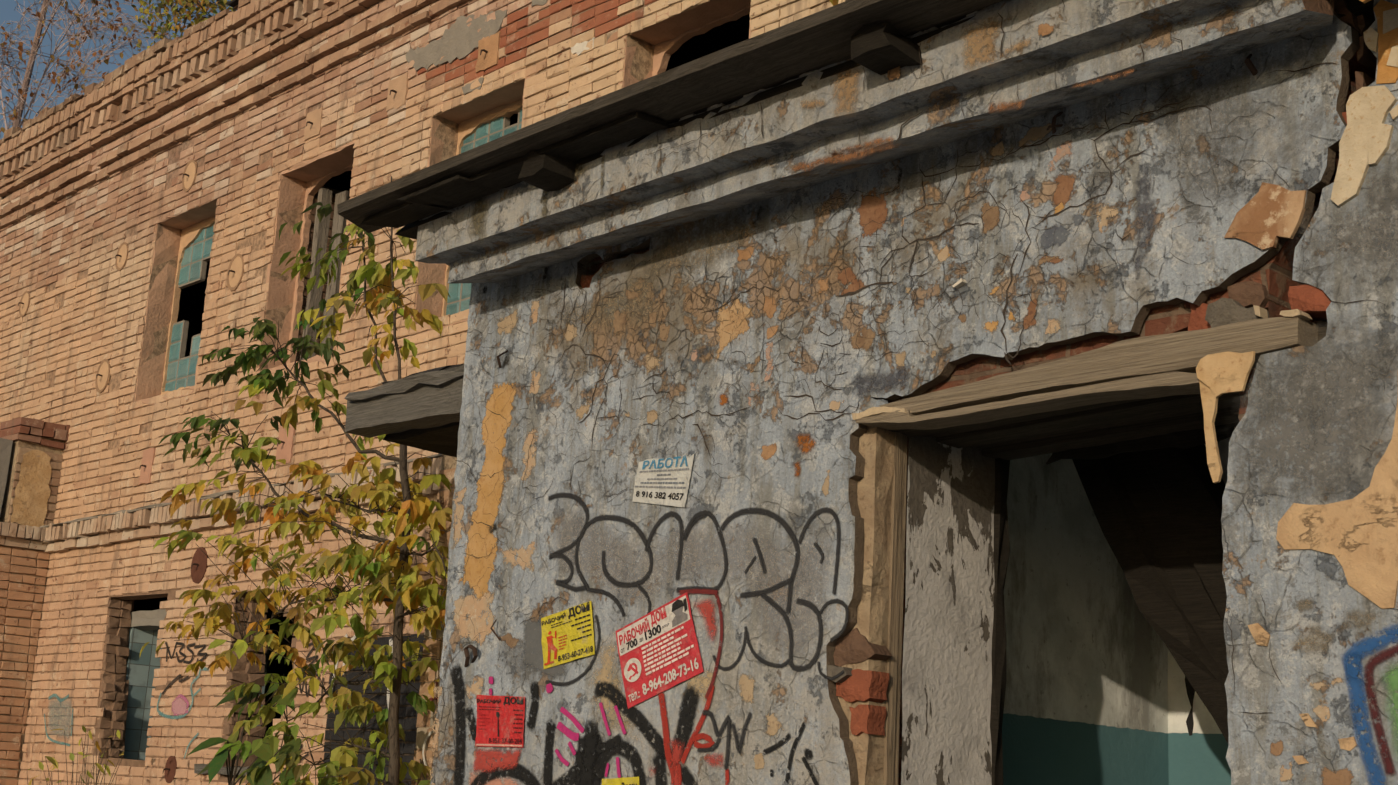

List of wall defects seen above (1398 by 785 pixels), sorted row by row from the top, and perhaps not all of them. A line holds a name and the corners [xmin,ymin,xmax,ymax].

crack [997,13,1005,52]
crack [1267,62,1339,74]
flaking render [1319,0,1398,260]
flaking render [1224,182,1307,251]
crack [456,84,1212,499]
spalling [1188,303,1211,331]
spalling [1227,281,1331,321]
peeling [451,369,541,649]
flaking render [1276,398,1398,626]
spalling [833,628,892,736]
crack [1185,676,1195,736]
crack [1227,614,1281,714]